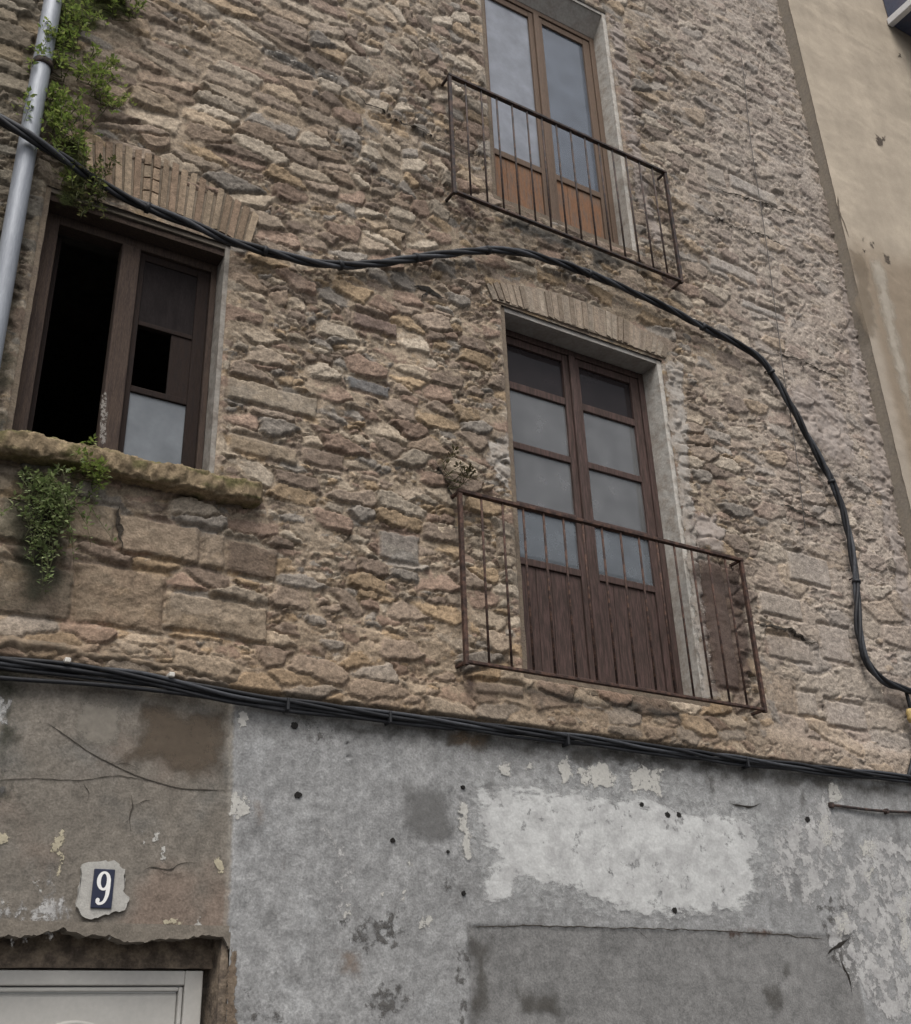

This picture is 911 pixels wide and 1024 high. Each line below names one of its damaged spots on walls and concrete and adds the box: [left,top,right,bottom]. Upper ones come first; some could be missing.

water stain [126,706,224,775]
peeling [237,708,249,730]
crack [4,724,215,831]
peeling [229,791,251,819]
spalling [324,830,407,950]
peeling [458,755,911,1023]
spalling [0,829,238,1024]
crack [476,924,852,991]
spalling [365,985,409,1020]